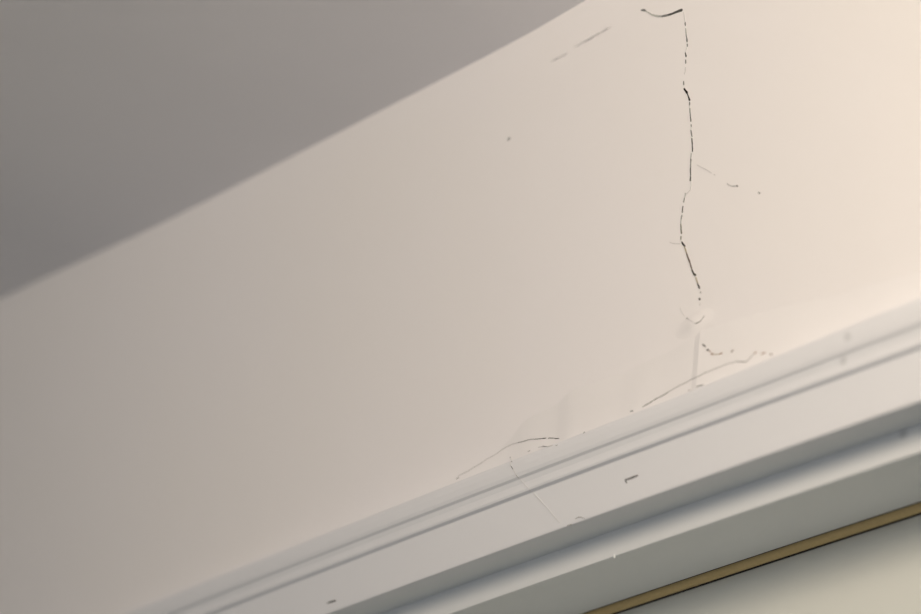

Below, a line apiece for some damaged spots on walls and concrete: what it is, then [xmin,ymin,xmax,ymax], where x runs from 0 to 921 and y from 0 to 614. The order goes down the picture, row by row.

crack [641,9,760,324]
crack [643,354,754,407]
crack [456,438,560,523]